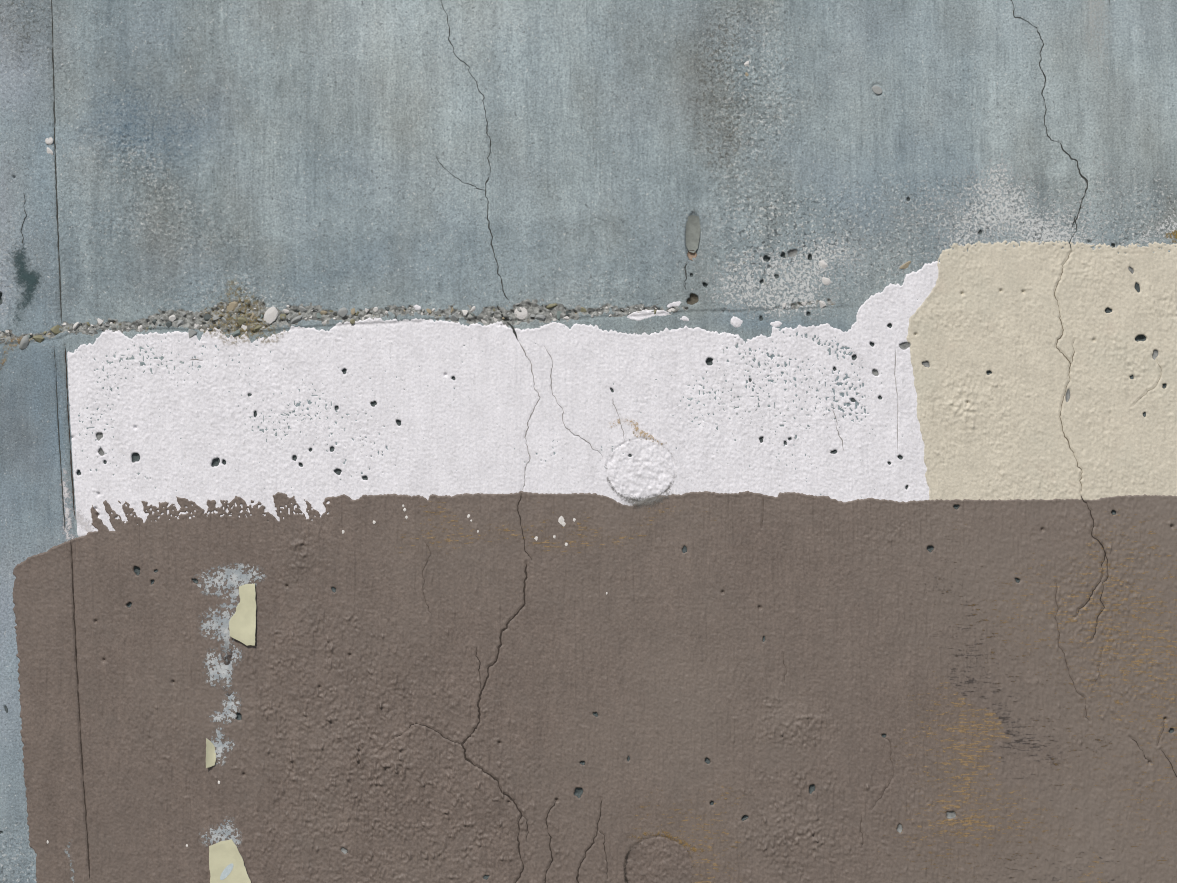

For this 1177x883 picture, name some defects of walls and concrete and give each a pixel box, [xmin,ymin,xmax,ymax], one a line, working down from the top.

crack [1011,0,1108,718]
crack [392,2,608,883]
peeling [197,563,265,662]
peeling [206,727,235,768]
peeling [201,819,251,883]